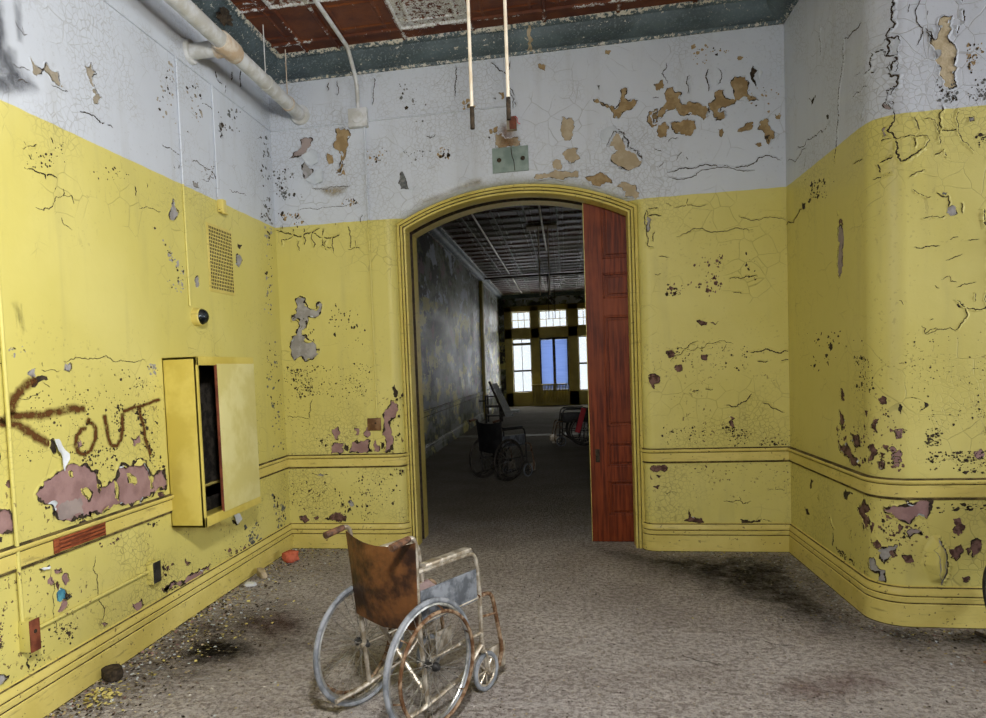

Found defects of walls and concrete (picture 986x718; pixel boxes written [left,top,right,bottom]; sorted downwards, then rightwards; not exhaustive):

peeling [926,14,986,103]
peeling [533,85,644,199]
peeling [645,65,781,147]
crack [607,0,986,334]
peeling [259,126,352,315]
peeling [19,363,168,525]
peeling [266,295,371,430]
peeling [316,385,404,454]
crack [671,340,789,364]
crack [692,387,785,412]
peeling [0,507,14,542]
peeling [857,497,986,583]